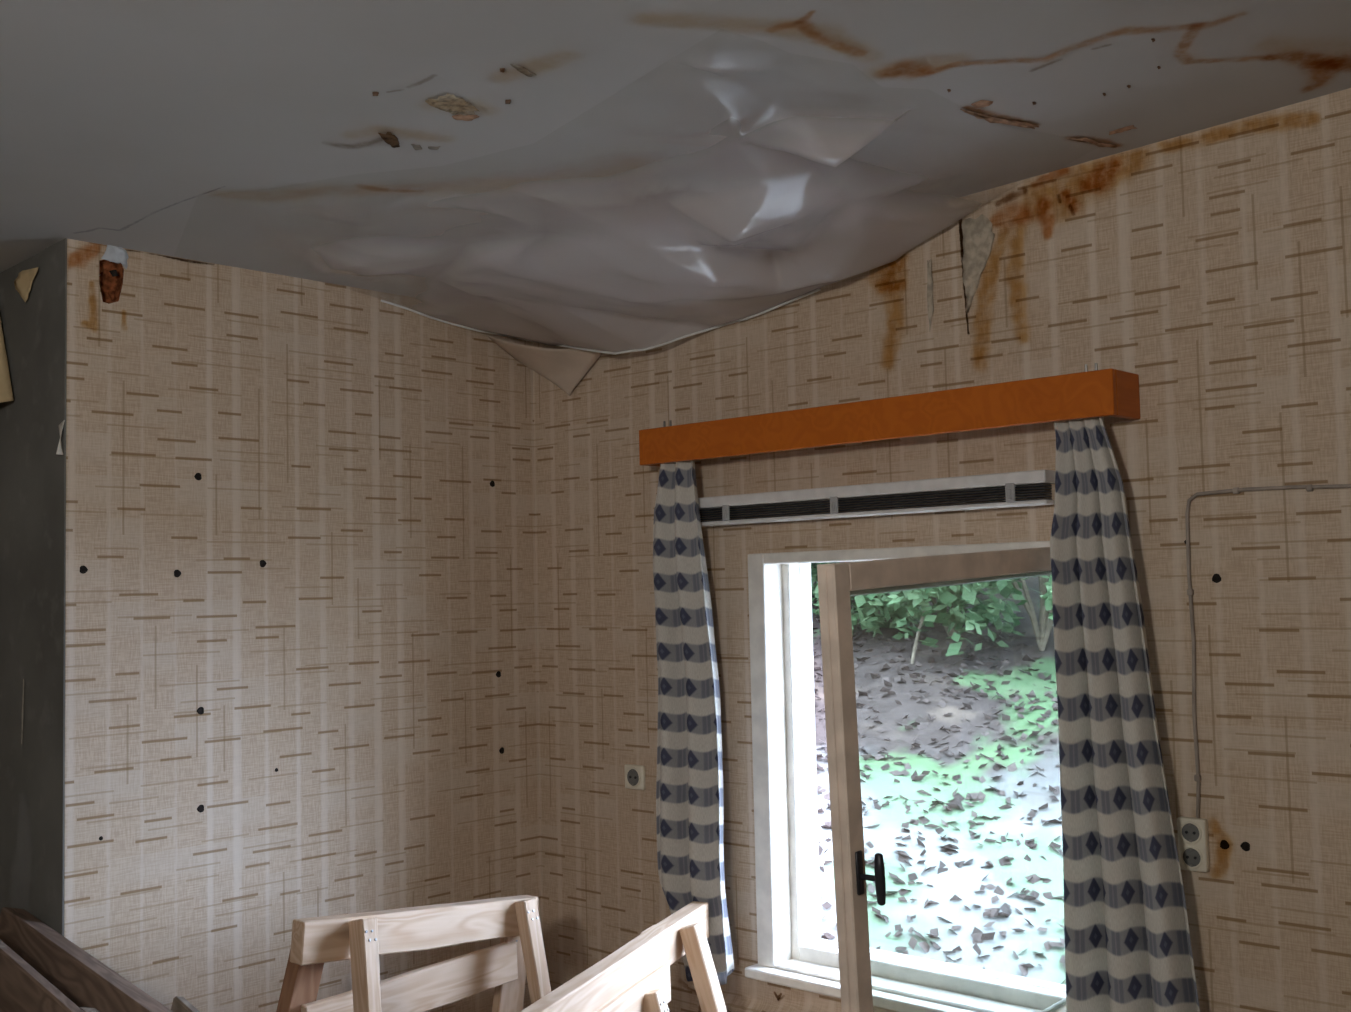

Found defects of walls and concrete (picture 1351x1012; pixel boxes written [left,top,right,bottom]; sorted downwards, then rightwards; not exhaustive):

peeling [425,93,480,121]
peeling [960,100,1039,129]
spalling [378,132,440,150]